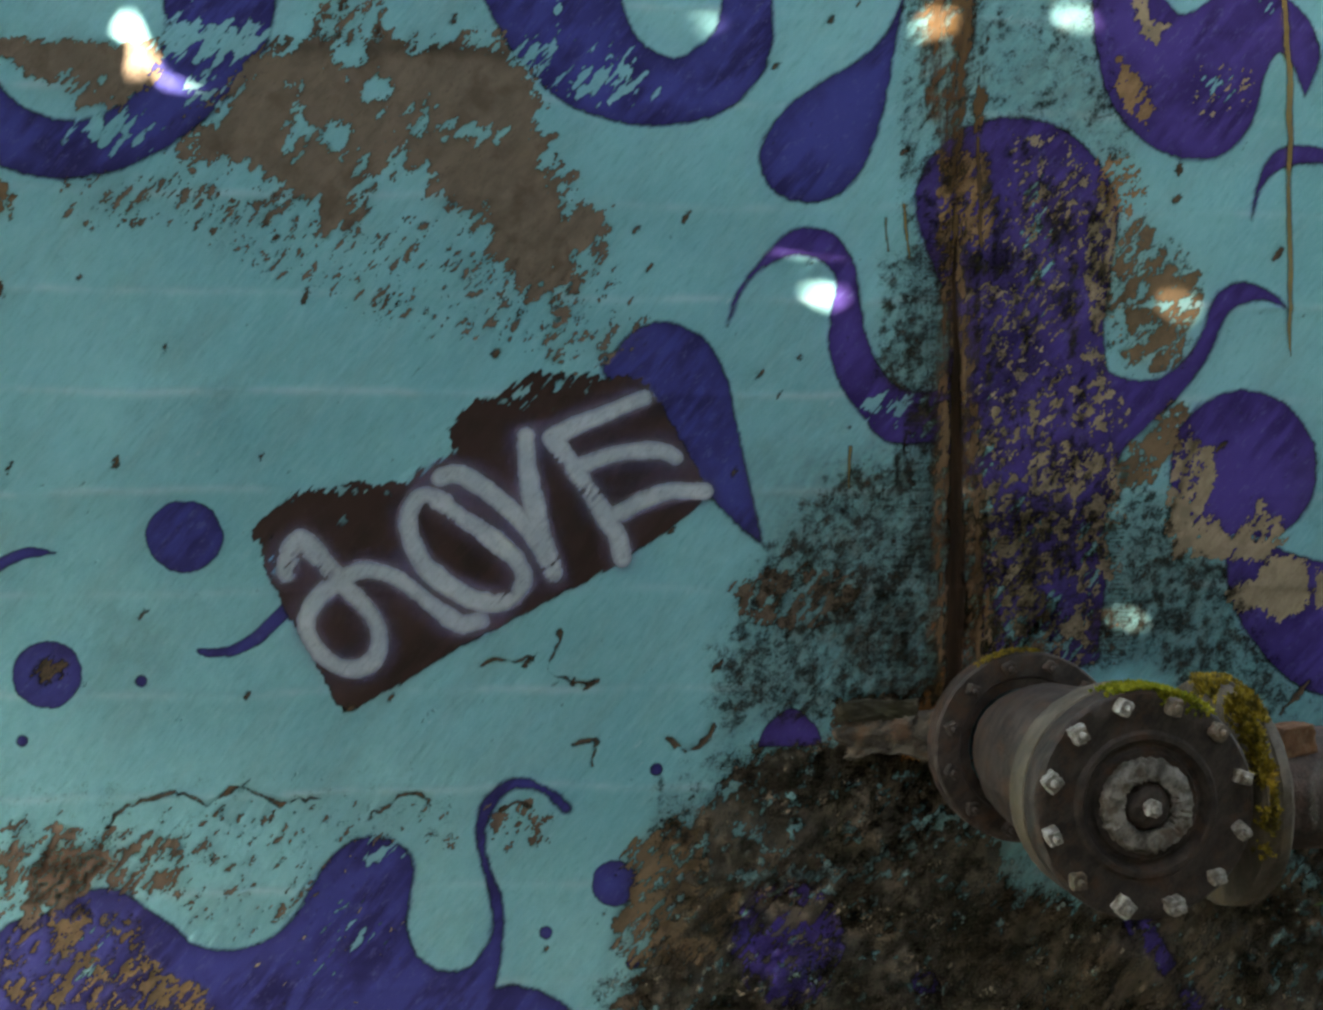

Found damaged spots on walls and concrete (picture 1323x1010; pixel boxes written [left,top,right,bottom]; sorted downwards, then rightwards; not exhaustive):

peeling [0,35,165,113]
peeling [0,179,18,221]
peeling [60,0,651,379]
corrosion [913,0,995,711]
peeling [934,129,1323,666]
peeling [0,795,404,1010]
peeling [411,804,459,850]
peeling [483,798,554,853]
water stain [592,738,1323,1010]